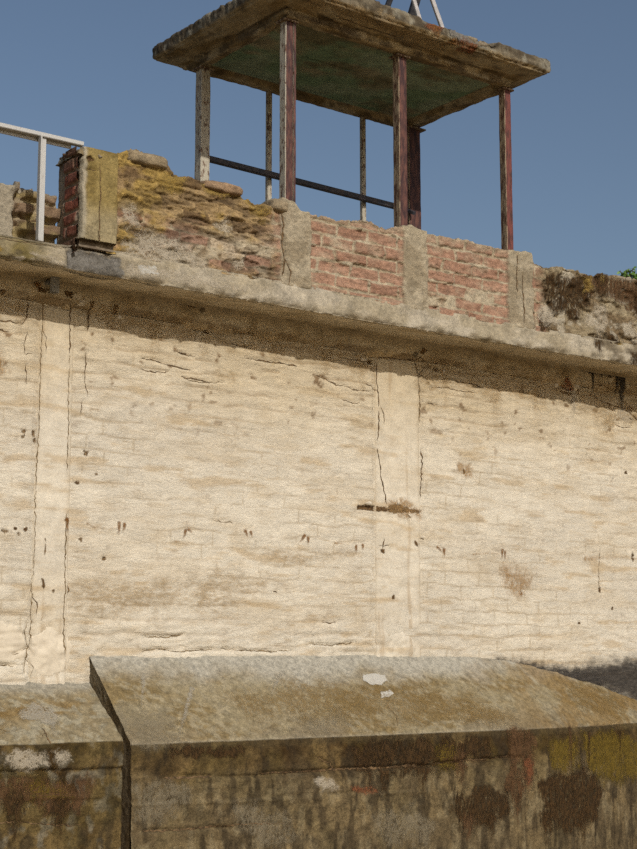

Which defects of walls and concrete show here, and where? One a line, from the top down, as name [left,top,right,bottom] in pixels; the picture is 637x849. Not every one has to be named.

crack [67,302,92,468]
crack [228,343,296,366]
crack [316,357,481,504]
damp [538,273,637,366]
crack [572,384,637,428]
crack [0,296,47,673]
crack [62,512,70,653]
damp [510,660,637,700]
damp [0,749,93,838]
damp [452,785,509,834]
damp [538,768,604,844]